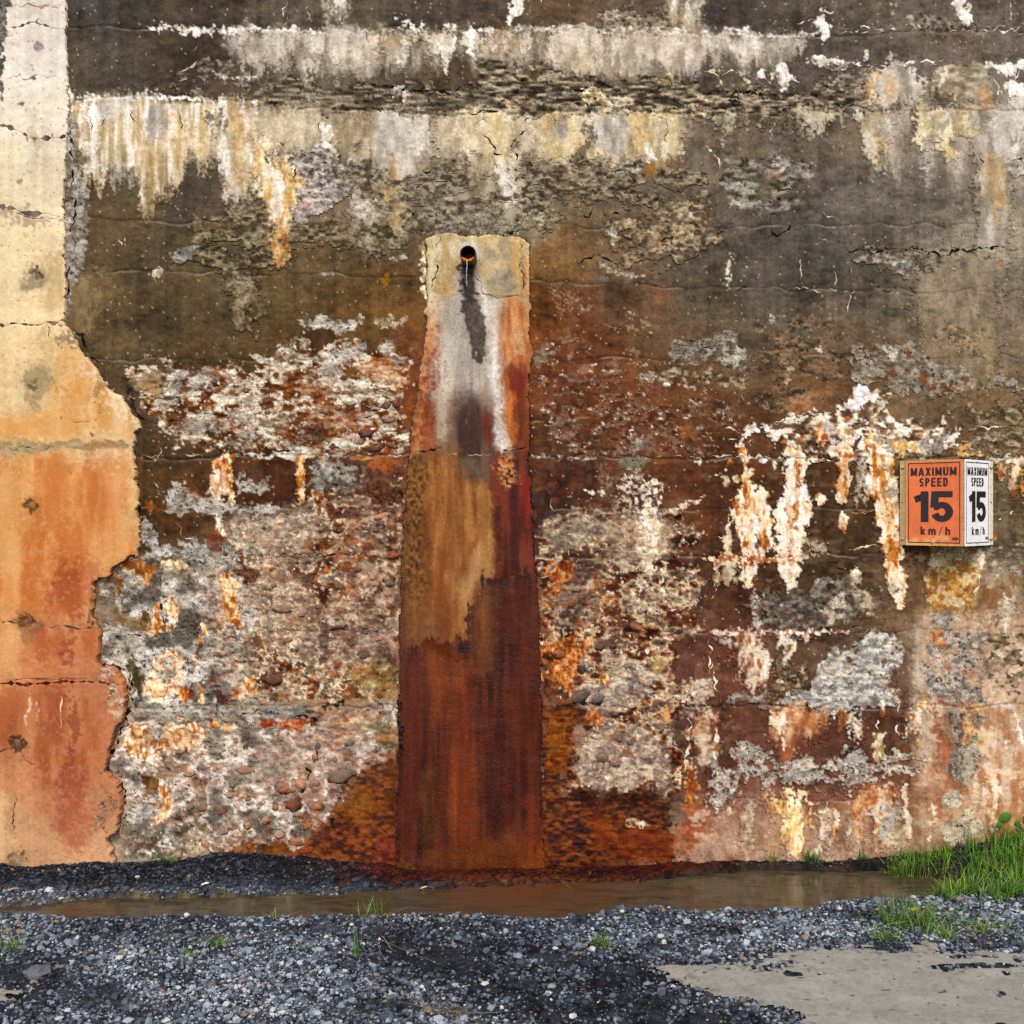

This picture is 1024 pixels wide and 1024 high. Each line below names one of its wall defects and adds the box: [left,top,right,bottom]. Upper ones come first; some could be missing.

rust [0,318,260,864]
spalling [147,201,275,297]
spalling [83,312,416,862]
rust [319,239,580,641]
water stain [72,0,1024,417]
water stain [531,452,661,463]
rust [539,626,729,868]
spalling [288,141,1024,800]
water stain [677,383,1024,863]
crack [818,239,1017,256]